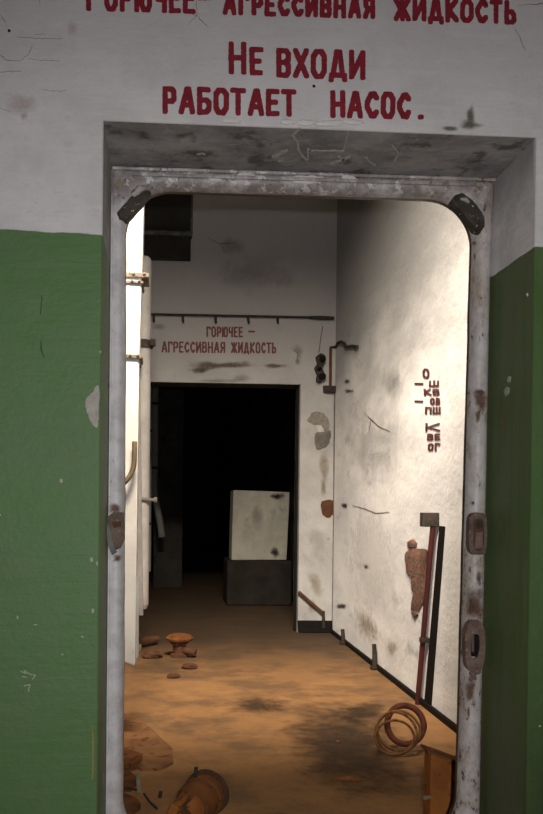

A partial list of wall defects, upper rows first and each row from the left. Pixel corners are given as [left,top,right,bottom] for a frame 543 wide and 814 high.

crack [0,16,63,73]
peeling [85,385,100,428]
rust [475,390,486,422]
spalling [307,411,331,450]